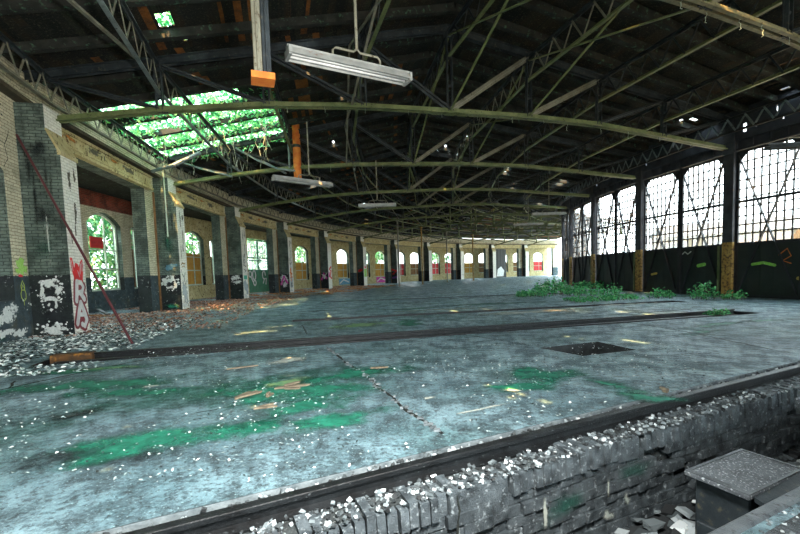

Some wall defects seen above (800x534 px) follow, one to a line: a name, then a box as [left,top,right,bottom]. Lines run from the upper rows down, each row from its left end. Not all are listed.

peeling [0,276,72,339]
crack [196,393,292,413]
crack [327,347,444,434]